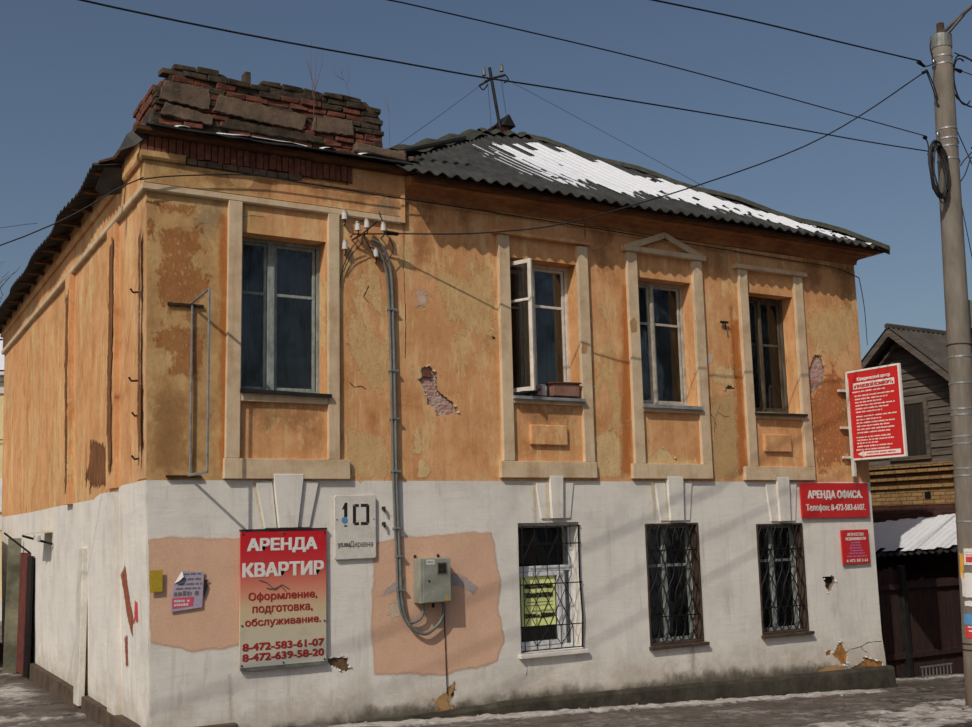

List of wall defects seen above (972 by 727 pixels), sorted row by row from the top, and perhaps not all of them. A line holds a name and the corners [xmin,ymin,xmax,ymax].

spalling [418,365,459,416]
peeling [808,353,850,474]
spalling [823,575,837,593]
peeling [327,654,352,672]
peeling [818,639,883,672]
peeling [433,681,456,712]